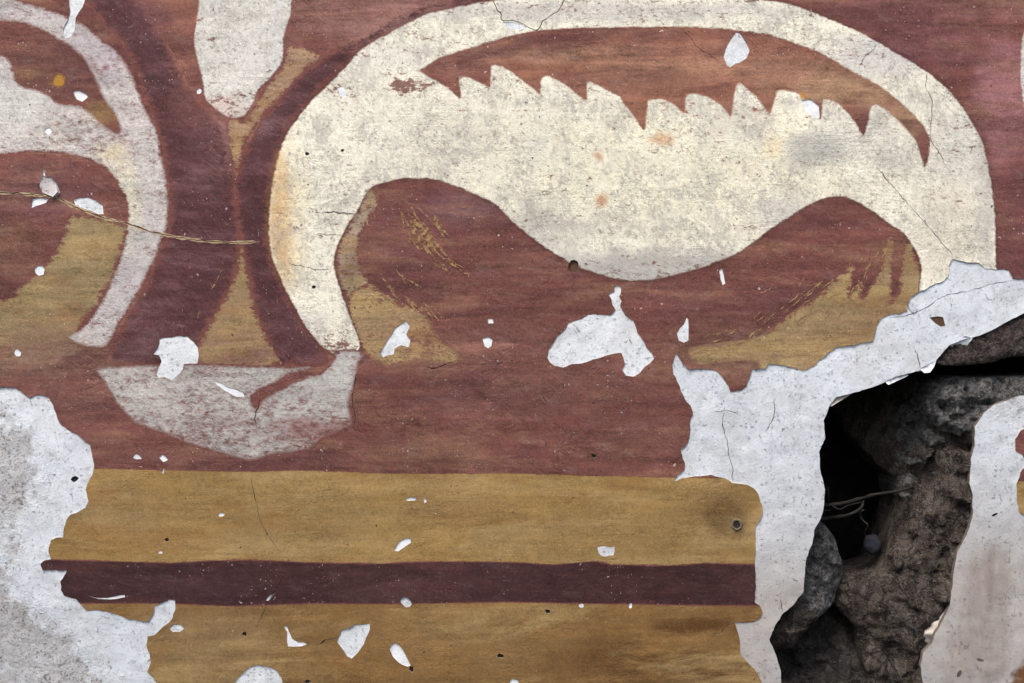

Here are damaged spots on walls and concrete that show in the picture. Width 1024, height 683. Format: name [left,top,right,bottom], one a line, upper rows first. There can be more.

peeling [724,32,750,67]
peeling [154,336,199,380]
peeling [380,321,411,357]
peeling [547,286,654,377]
peeling [672,259,1024,683]
peeling [0,387,184,683]
peeling [337,623,370,658]